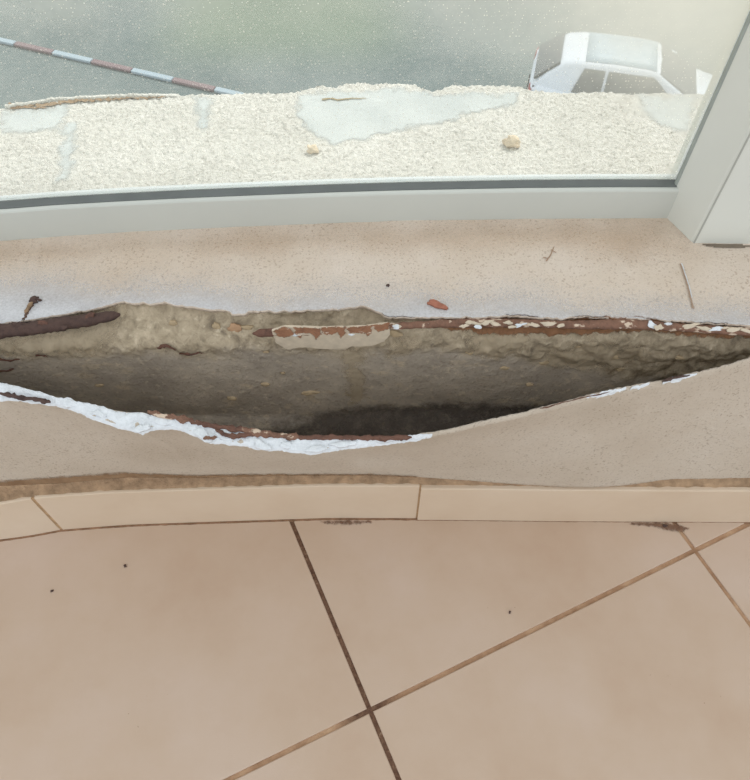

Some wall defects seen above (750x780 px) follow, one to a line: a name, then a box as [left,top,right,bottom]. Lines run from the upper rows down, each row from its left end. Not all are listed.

peeling [297,87,518,145]
rust [273,313,415,339]
rust [442,314,750,339]
spalling [0,304,750,455]
rust [0,392,51,404]
rust [147,410,412,442]
water stain [271,403,536,438]